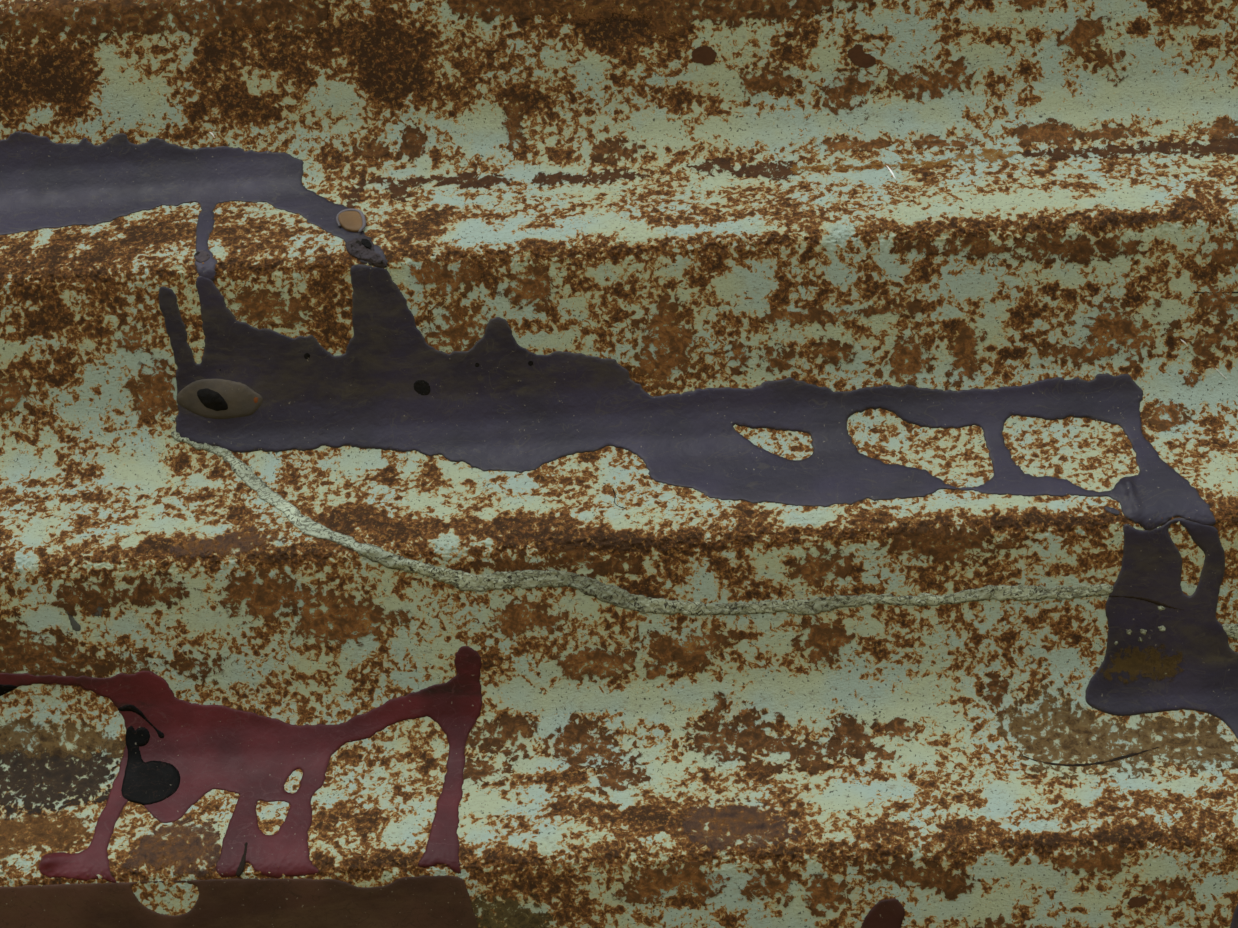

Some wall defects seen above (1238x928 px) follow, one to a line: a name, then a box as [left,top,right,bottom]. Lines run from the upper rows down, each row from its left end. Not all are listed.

rust [819,44,975,120]
rust [346,121,514,209]
rust [531,138,651,188]
rust [686,118,1238,180]
rust [1029,285,1238,387]
rust [169,526,413,650]
crack [1109,595,1184,611]
rust [0,718,126,868]
rust [463,711,651,795]
rust [682,691,919,776]
rust [979,670,1238,779]
rust [610,796,981,918]